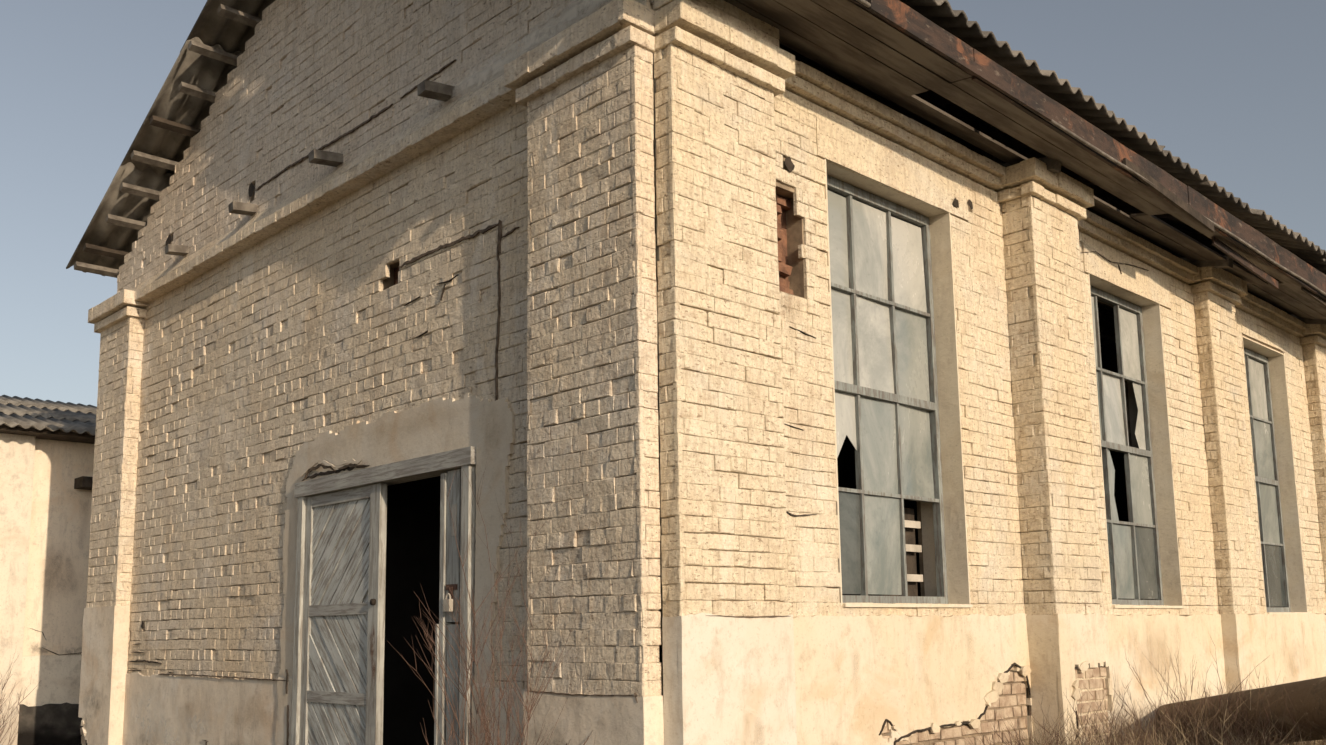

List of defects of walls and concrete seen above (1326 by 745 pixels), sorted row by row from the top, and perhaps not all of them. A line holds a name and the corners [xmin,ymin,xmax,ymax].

crack [255,59,456,191]
crack [399,220,519,401]
peeling [300,459,369,481]
flaking render [879,663,1031,745]
flaking render [1071,661,1110,745]